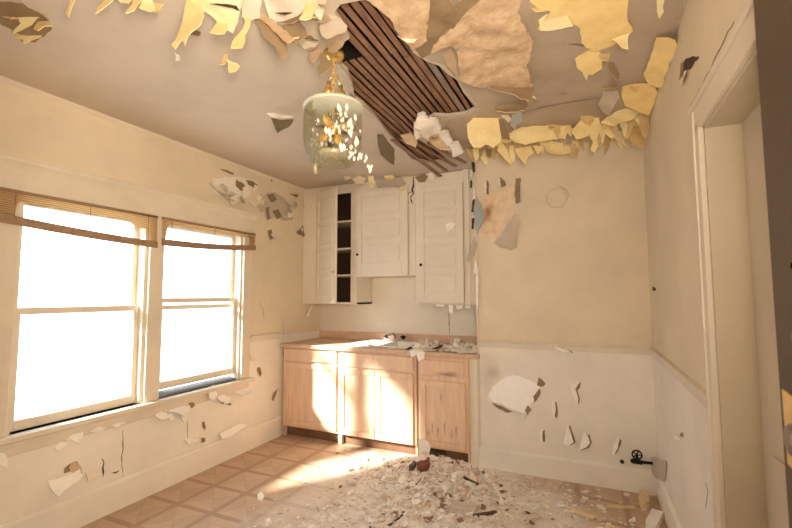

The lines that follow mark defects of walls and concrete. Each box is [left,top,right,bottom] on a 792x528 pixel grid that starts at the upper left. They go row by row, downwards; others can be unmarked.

peeling [0,1,52,44]
peeling [96,0,163,14]
peeling [171,0,262,73]
peeling [266,113,294,133]
peeling [333,0,699,332]
peeling [209,169,305,221]
peeling [155,402,195,422]
spalling [486,375,545,421]
crack [102,433,124,476]
peeling [563,425,592,450]
peeling [48,461,101,497]